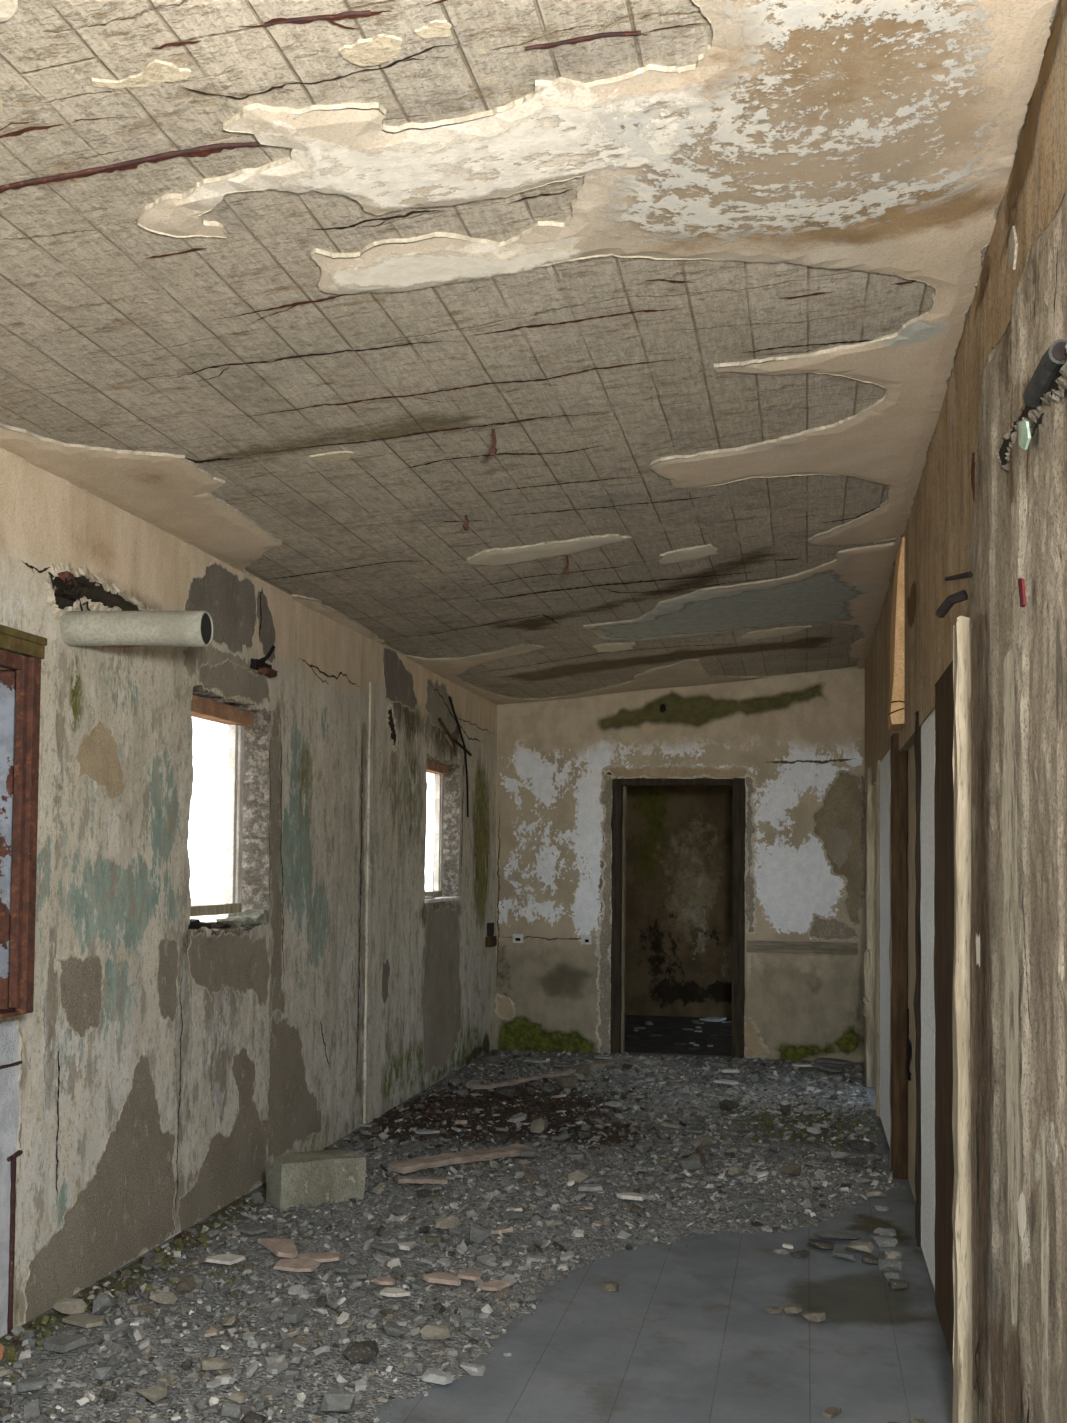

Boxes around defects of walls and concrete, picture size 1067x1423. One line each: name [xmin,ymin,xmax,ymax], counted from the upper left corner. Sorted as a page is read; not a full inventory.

crack [152,41,200,49]
crack [240,11,388,29]
crack [173,41,466,100]
crack [536,23,705,49]
crack [0,117,127,138]
crack [0,143,259,194]
crack [508,189,572,204]
spalling [0,0,994,753]
spalling [996,344,1067,474]
mould [599,684,822,730]
spalling [806,770,866,942]
peeling [595,763,758,1053]